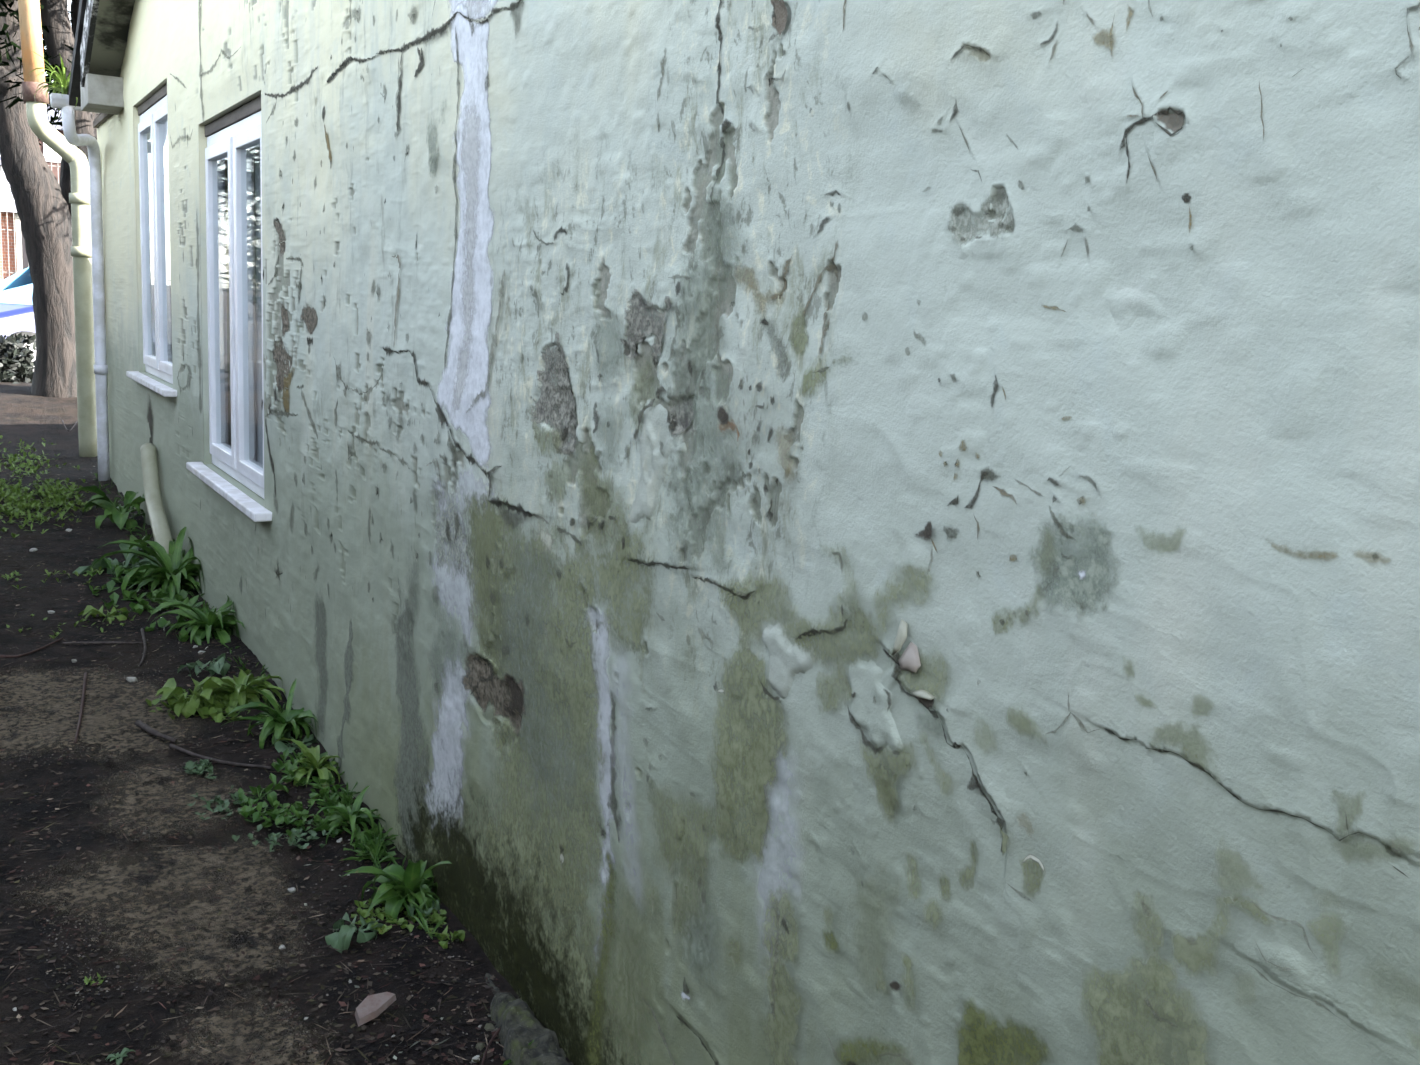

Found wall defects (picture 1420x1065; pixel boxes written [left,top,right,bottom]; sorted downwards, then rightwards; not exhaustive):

crack [265,0,523,130]
crack [710,0,731,206]
peeling [1121,88,1184,183]
peeling [261,204,318,530]
crack [334,255,581,545]
spalling [531,333,576,455]
peeling [557,275,705,533]
crack [915,468,1042,571]
water stain [394,602,467,853]
water stain [437,449,651,925]
water stain [711,565,930,861]
water stain [763,893,801,1065]